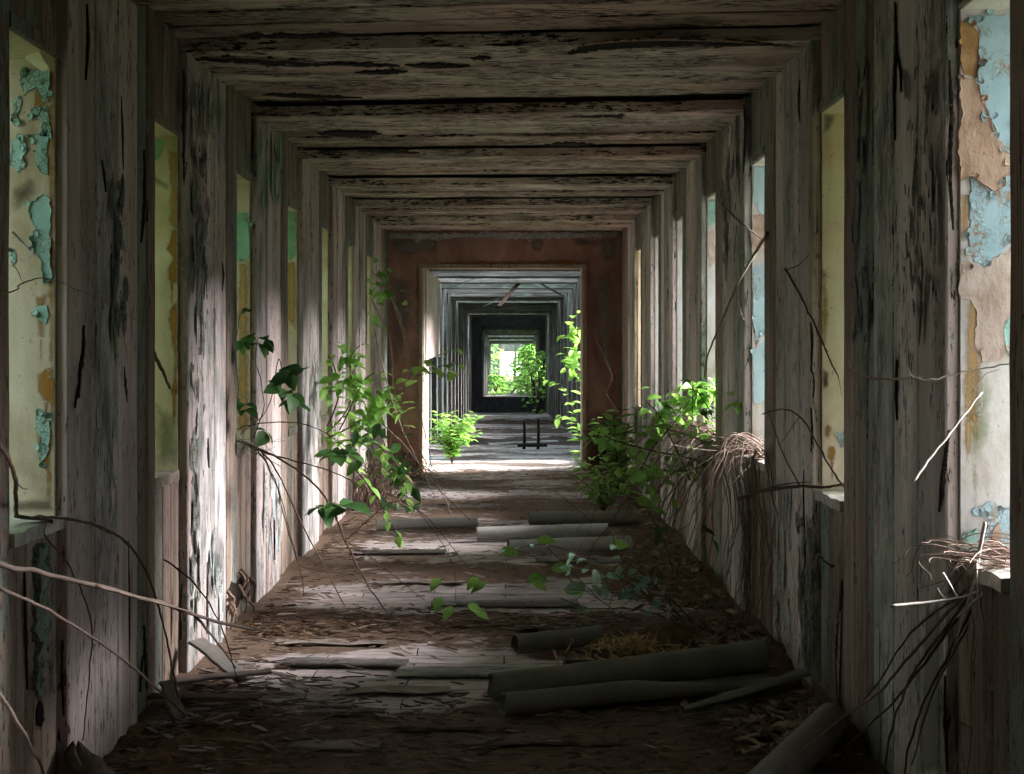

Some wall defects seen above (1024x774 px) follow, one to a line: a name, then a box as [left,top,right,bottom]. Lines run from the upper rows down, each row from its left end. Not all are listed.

crack [892,2,902,140]
peeling [10,67,52,175]
flaking render [956,8,1011,362]
peeling [24,194,56,284]
peeling [31,305,49,325]
crack [74,325,86,408]
peeling [34,408,53,468]
peeling [960,501,1010,551]